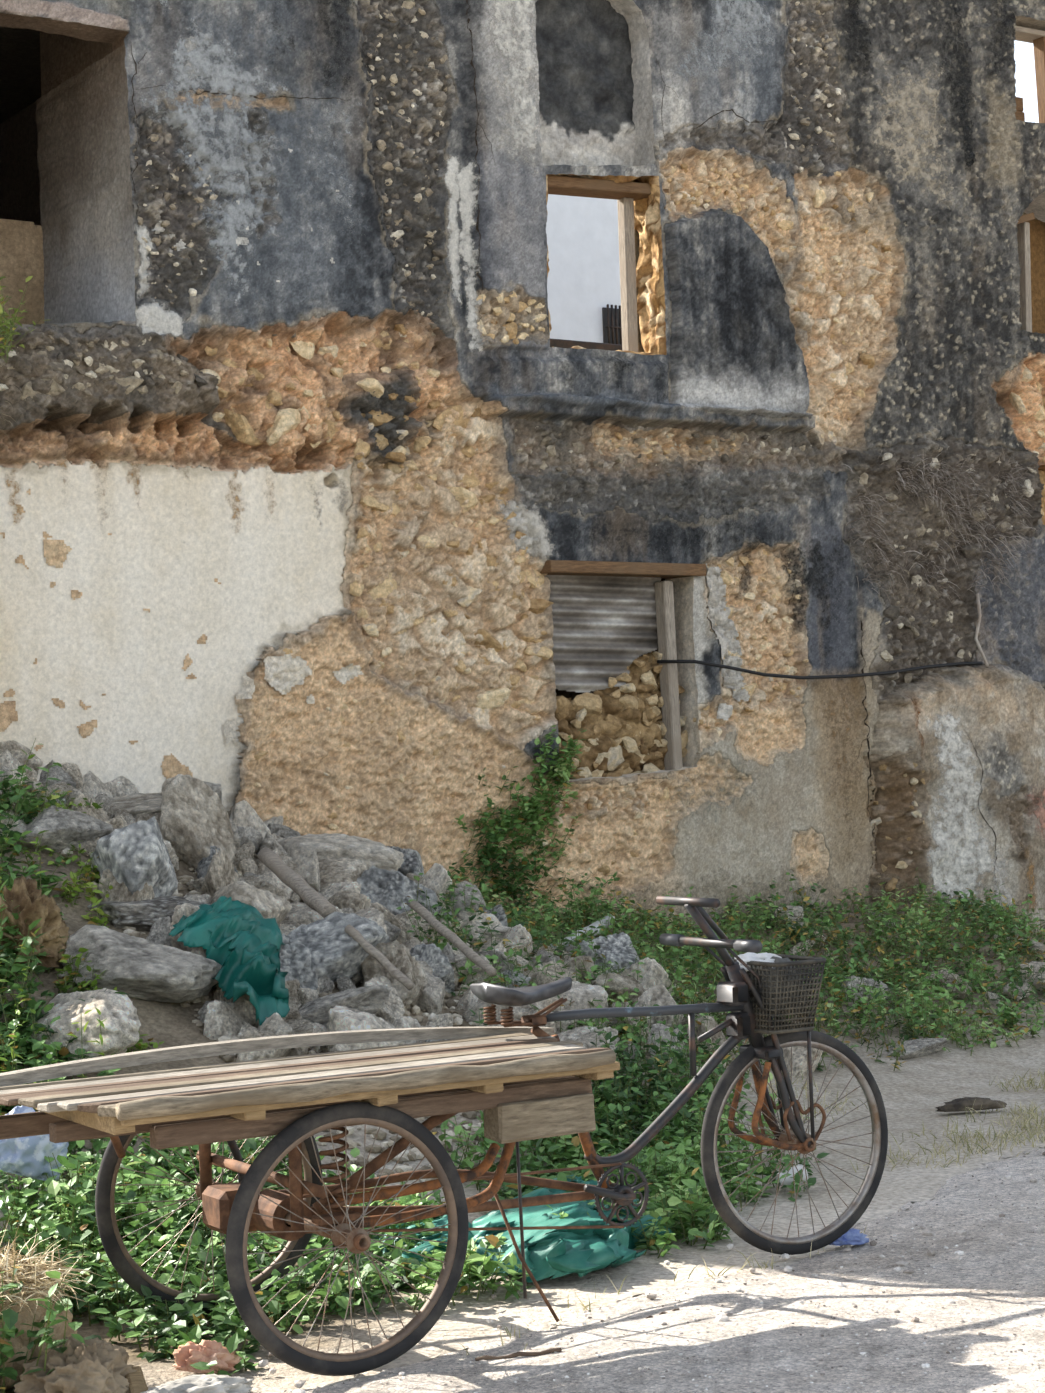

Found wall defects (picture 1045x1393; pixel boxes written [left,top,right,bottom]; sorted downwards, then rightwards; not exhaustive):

efflorescence [135,225,184,336]
damp [143,19,288,303]
efflorescence [444,156,483,352]
damp [845,0,977,203]
spalling [0,0,1045,922]
efflorescence [498,500,554,560]
damp [576,506,770,592]